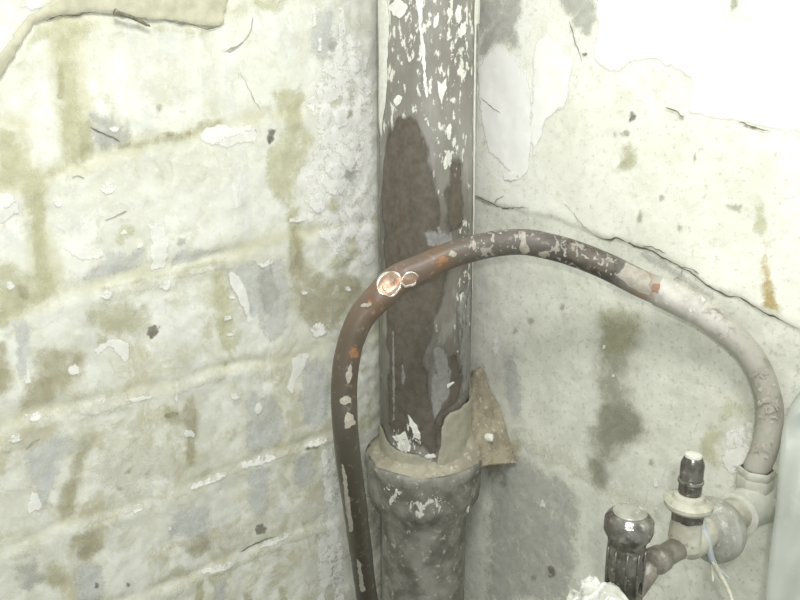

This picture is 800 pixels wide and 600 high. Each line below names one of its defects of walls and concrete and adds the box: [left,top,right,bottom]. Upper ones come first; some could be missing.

peeling [479,0,520,54]
peeling [561,0,595,61]
peeling [290,7,376,265]
crack [477,195,525,209]
peeling [227,260,289,340]
damp [290,211,361,338]
crack [565,204,798,329]
rust [763,265,778,309]
damp [25,351,82,406]
damp [593,314,641,487]
damp [63,479,78,511]
spalling [241,524,276,552]